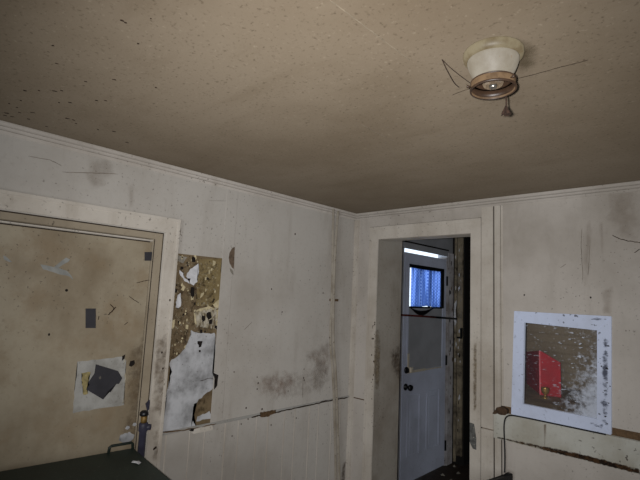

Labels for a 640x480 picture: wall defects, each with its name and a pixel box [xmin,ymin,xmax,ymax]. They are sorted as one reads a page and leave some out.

peeling [163,254,222,434]